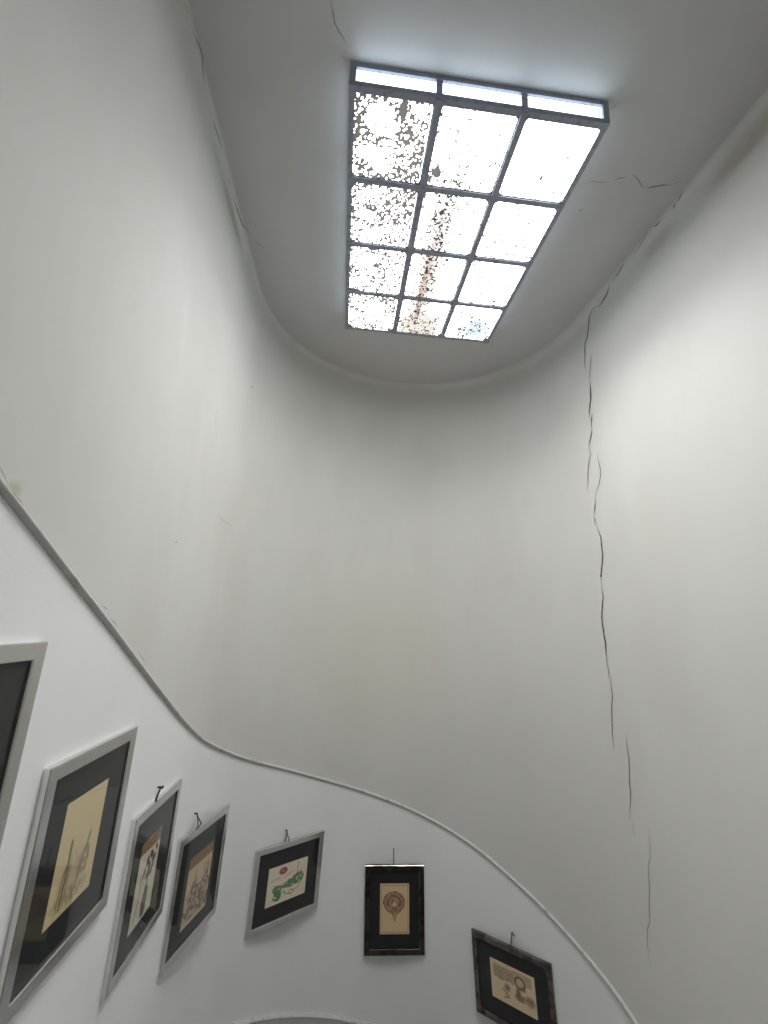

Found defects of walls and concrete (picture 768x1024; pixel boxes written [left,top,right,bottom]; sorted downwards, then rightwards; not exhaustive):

crack [584,288,631,804]